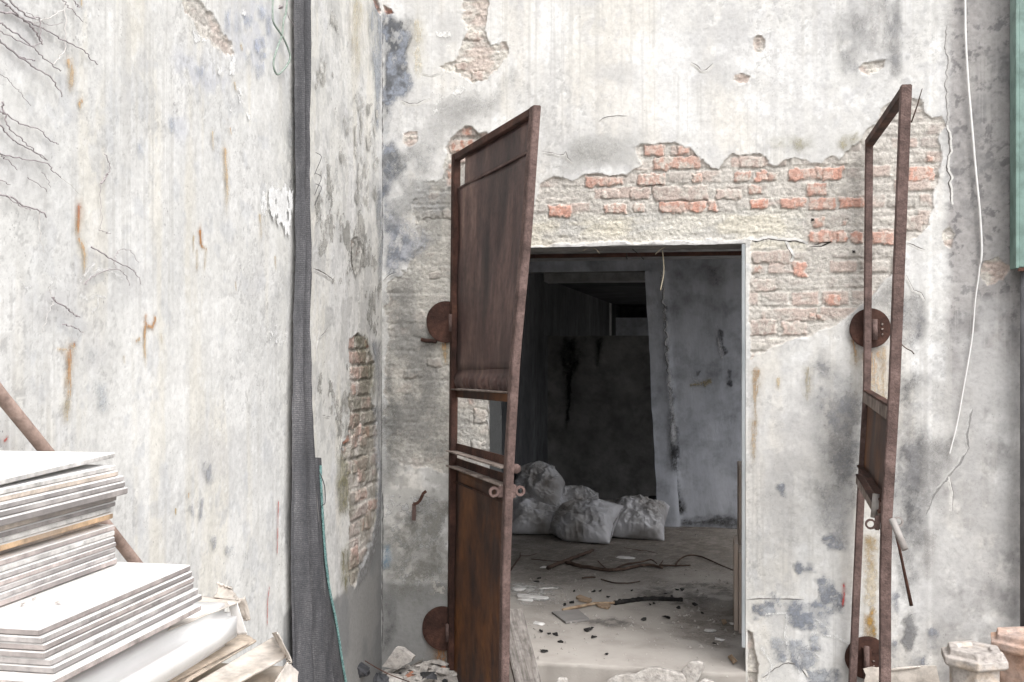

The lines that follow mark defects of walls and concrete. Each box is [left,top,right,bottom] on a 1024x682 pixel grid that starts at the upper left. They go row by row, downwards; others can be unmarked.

spalling [182,0,236,75]
water stain [369,6,412,127]
spalling [432,0,509,117]
crack [944,25,954,204]
corrosion [77,205,86,268]
peeling [261,179,294,240]
flaking render [531,98,946,360]
corrosion [59,343,75,421]
flaking render [315,97,490,595]
crack [924,409,973,516]